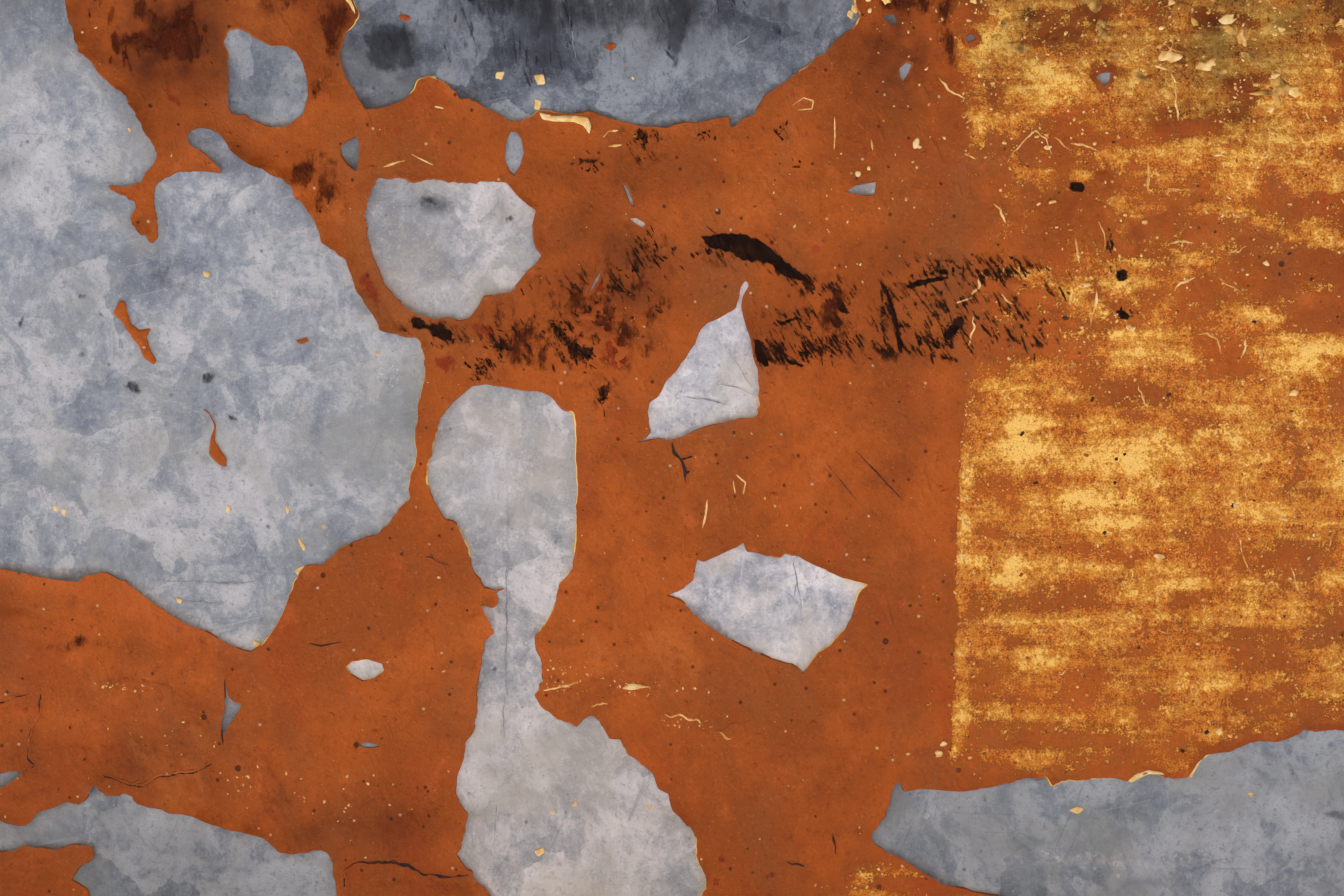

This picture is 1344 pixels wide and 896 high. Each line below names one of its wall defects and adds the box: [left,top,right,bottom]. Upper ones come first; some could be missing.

peeling [0,0,907,896]
peeling [846,0,1344,896]